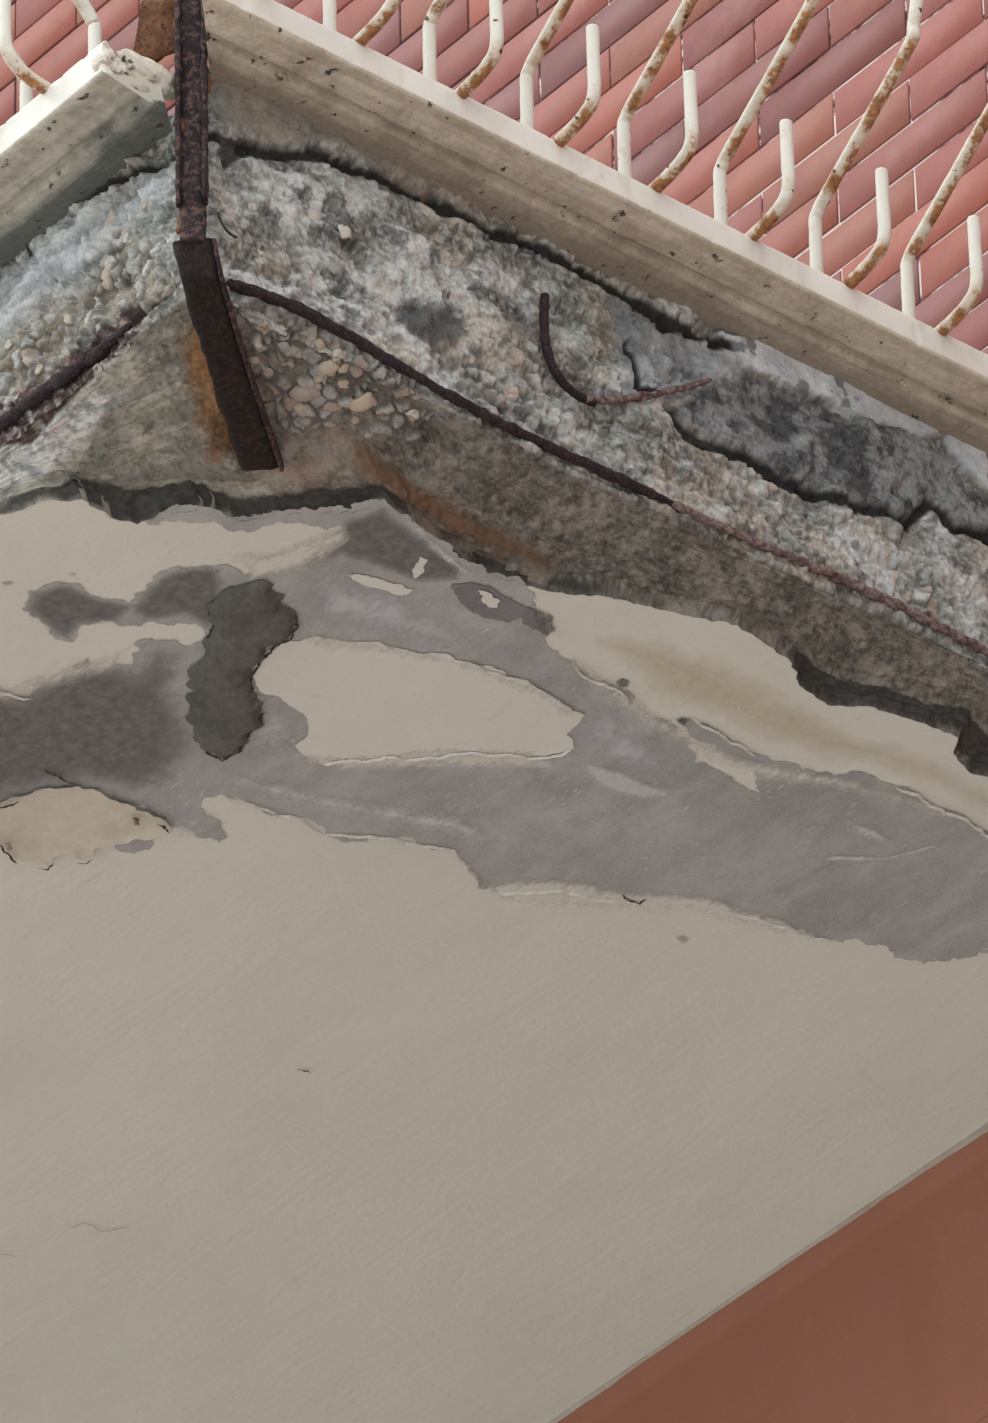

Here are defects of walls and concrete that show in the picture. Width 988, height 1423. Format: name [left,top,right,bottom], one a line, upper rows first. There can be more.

crack [208,133,730,349]
corrosion [186,330,235,456]
peeling [0,133,988,965]
crack [623,346,988,546]